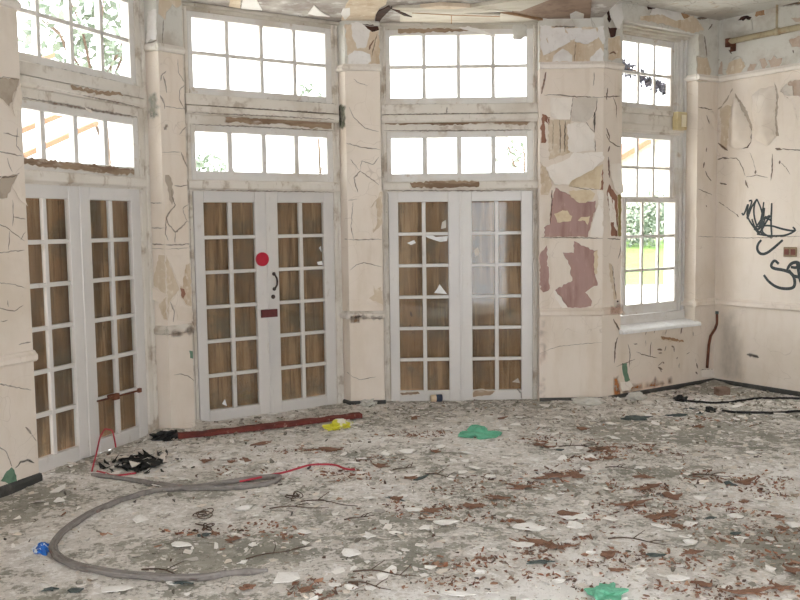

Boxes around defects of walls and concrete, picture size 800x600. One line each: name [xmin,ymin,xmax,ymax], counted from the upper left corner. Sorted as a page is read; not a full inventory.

peeling [229,0,262,10]
peeling [308,6,330,17]
peeling [341,0,624,64]
peeling [0,77,22,118]
crack [0,215,24,253]
peeling [0,173,28,206]
crack [152,175,187,249]
crack [160,72,526,240]
peeling [538,97,624,308]
crack [699,143,800,217]
peeling [152,254,193,321]
peeling [620,363,633,391]